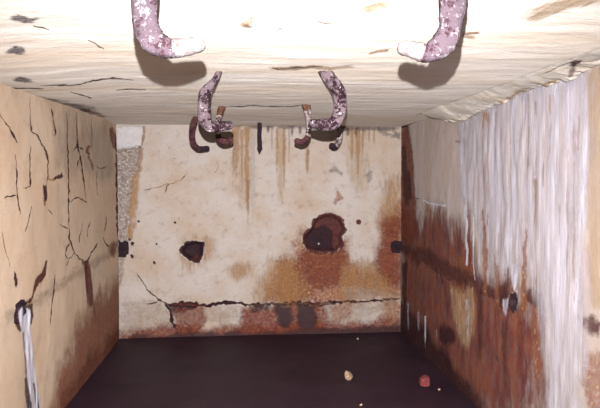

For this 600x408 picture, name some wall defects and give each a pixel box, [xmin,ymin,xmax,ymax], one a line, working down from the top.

crack [13,77,144,98]
crack [0,108,118,266]
spalling [116,126,145,246]
crack [2,233,18,287]
spalling [179,240,205,263]
rust [57,126,547,408]
spalling [302,213,347,254]
damp [401,72,600,408]
crack [137,274,400,329]